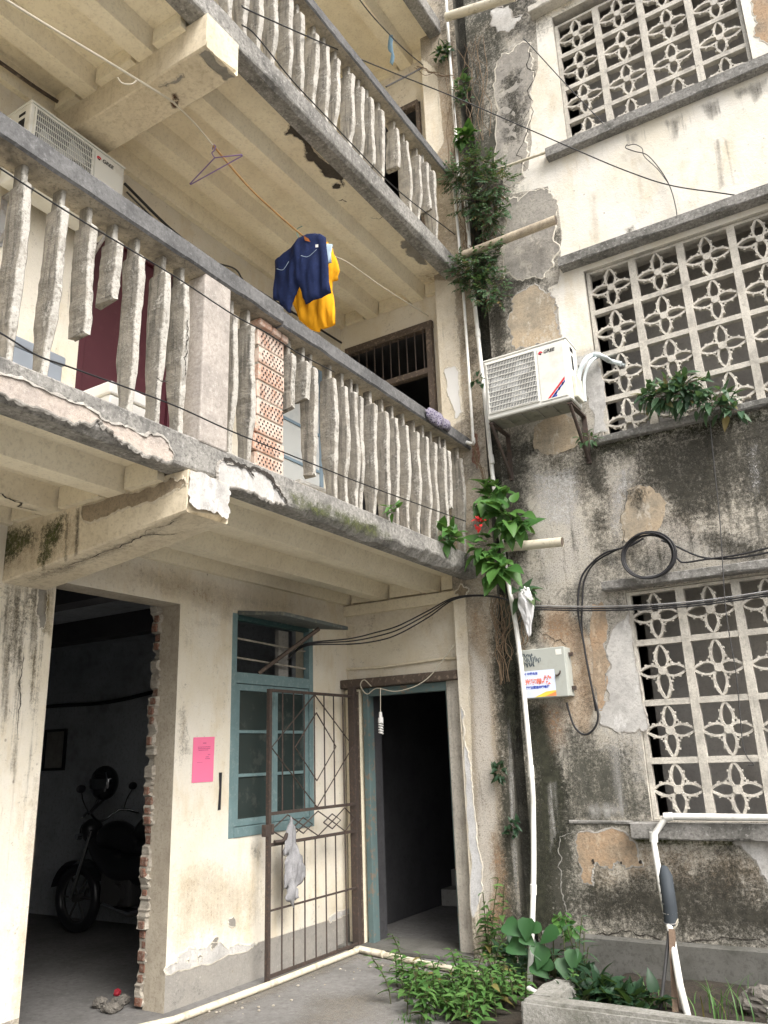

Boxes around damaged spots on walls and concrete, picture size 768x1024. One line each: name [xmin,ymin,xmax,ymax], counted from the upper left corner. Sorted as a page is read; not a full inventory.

spalling [284,124,345,189]
flaking render [492,41,562,351]
spalling [0,372,286,524]
water stain [4,527,34,564]
crack [70,518,177,565]
water stain [535,438,645,539]
flaking render [620,485,666,542]
water stain [692,531,766,560]
flaking render [590,602,650,734]
spalling [574,826,644,886]
peeling [163,935,258,976]